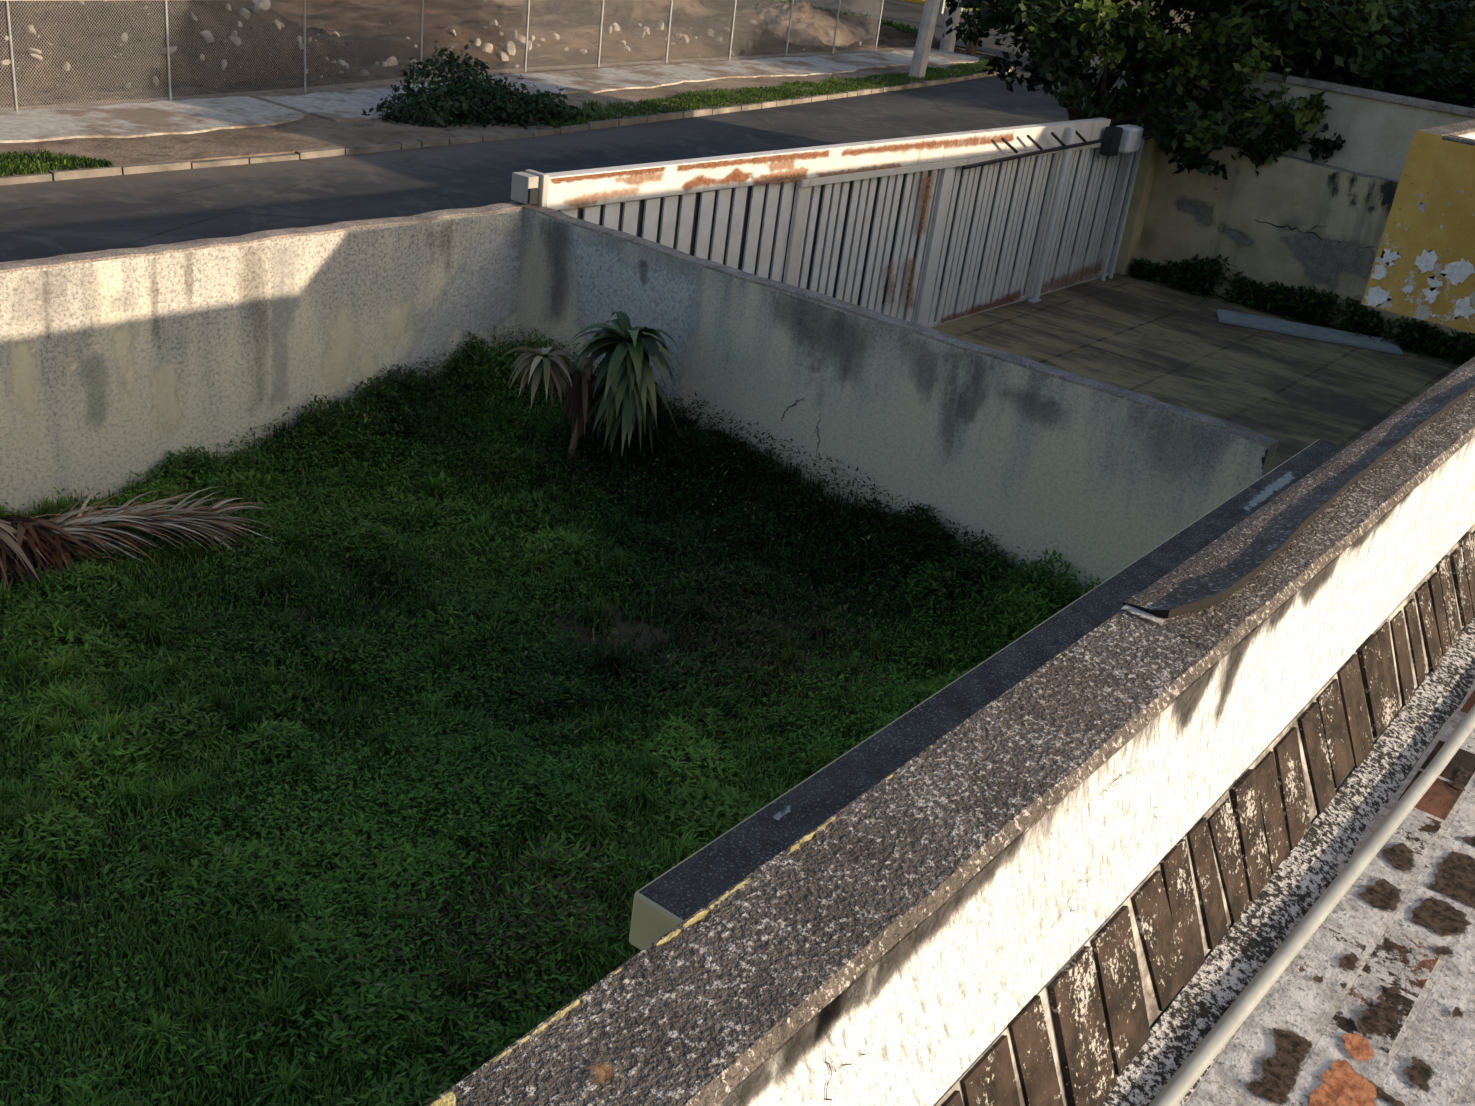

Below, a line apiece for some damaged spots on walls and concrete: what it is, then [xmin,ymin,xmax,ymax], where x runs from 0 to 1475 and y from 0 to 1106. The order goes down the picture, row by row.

corrosion [551,134,1014,208]
corrosion [888,259,914,306]
flaking render [1282,232,1475,321]
peeling [1449,767,1470,791]
peeling [1357,836,1475,955]
peeling [1312,952,1360,988]
peeling [1245,986,1405,1106]
peeling [1403,1056,1438,1093]